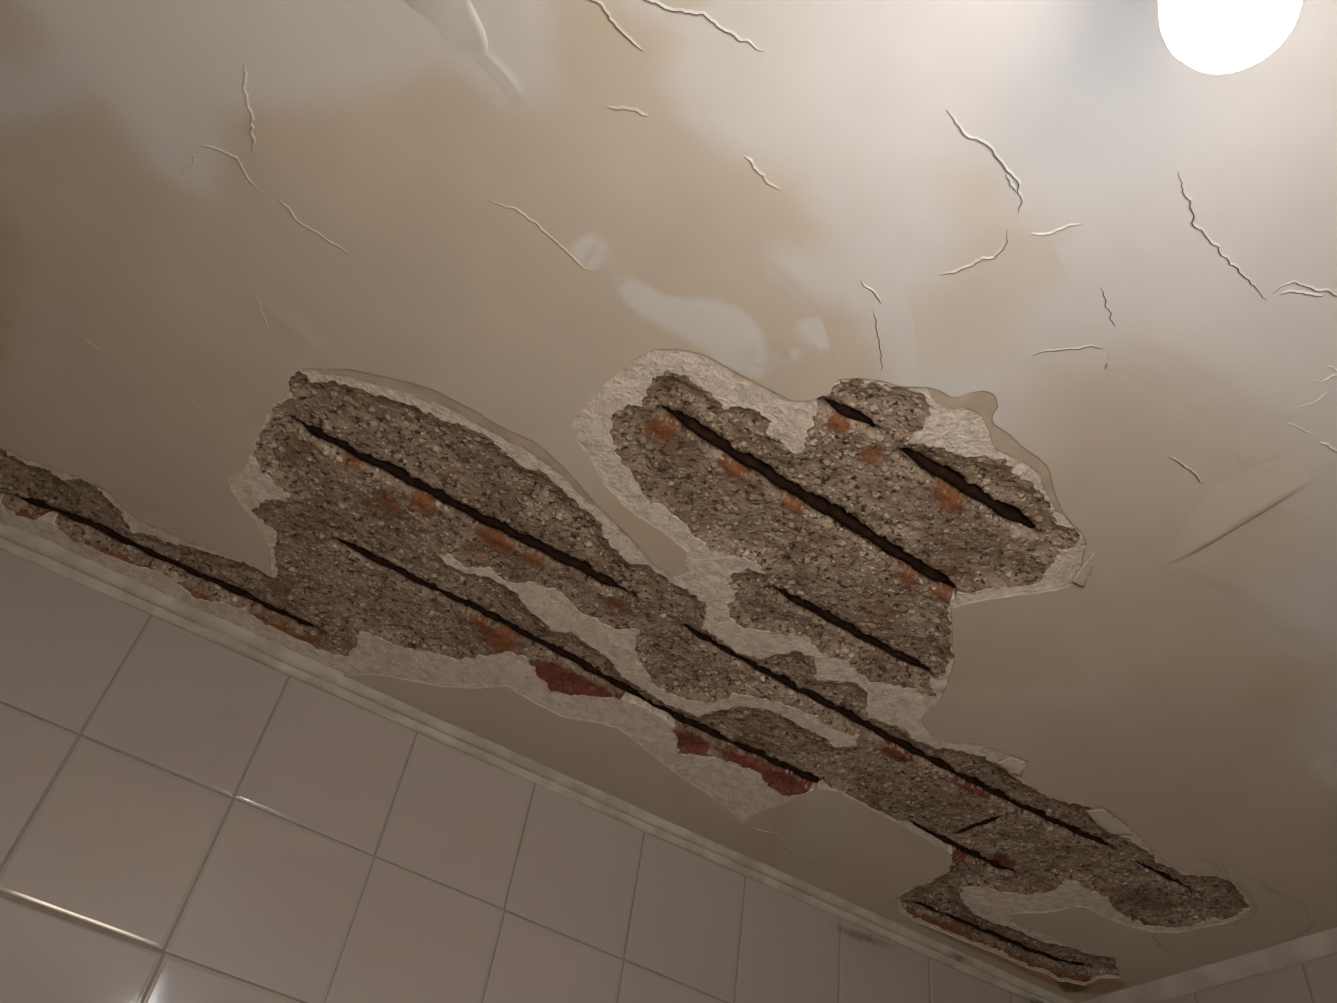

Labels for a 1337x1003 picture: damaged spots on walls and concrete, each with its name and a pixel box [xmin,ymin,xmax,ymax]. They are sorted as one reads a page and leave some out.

crack [587,0,644,52]
crack [642,0,764,53]
crack [178,61,349,255]
crack [940,109,1084,276]
crack [488,200,598,272]
crack [1177,172,1337,300]
rust [934,479,964,513]
rust [474,524,545,566]
rust [472,615,518,652]
rust [530,661,611,697]
spalling [0,349,1251,985]
rust [673,730,813,796]